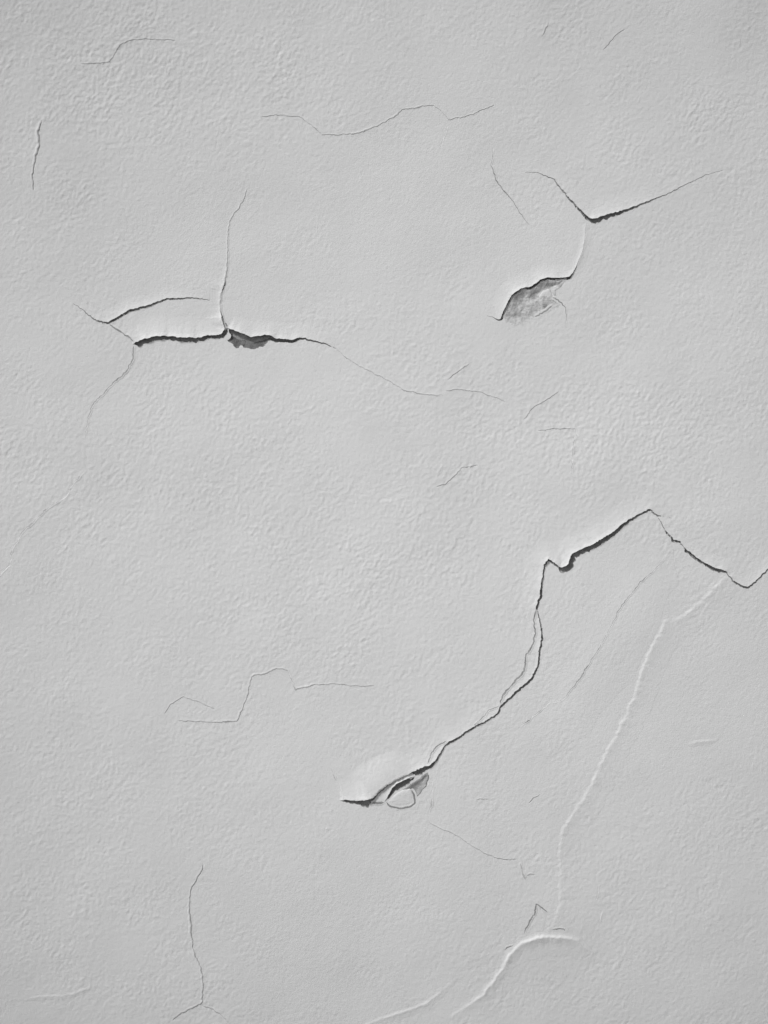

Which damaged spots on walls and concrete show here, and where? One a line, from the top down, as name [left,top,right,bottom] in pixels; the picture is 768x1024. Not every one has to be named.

crack [262,104,494,147]
crack [490,149,529,225]
crack [528,163,723,224]
flaking render [488,223,591,326]
crack [73,189,578,474]
crack [164,666,374,724]
crack [330,491,768,880]
flaking render [383,772,429,811]
crack [173,864,229,1023]